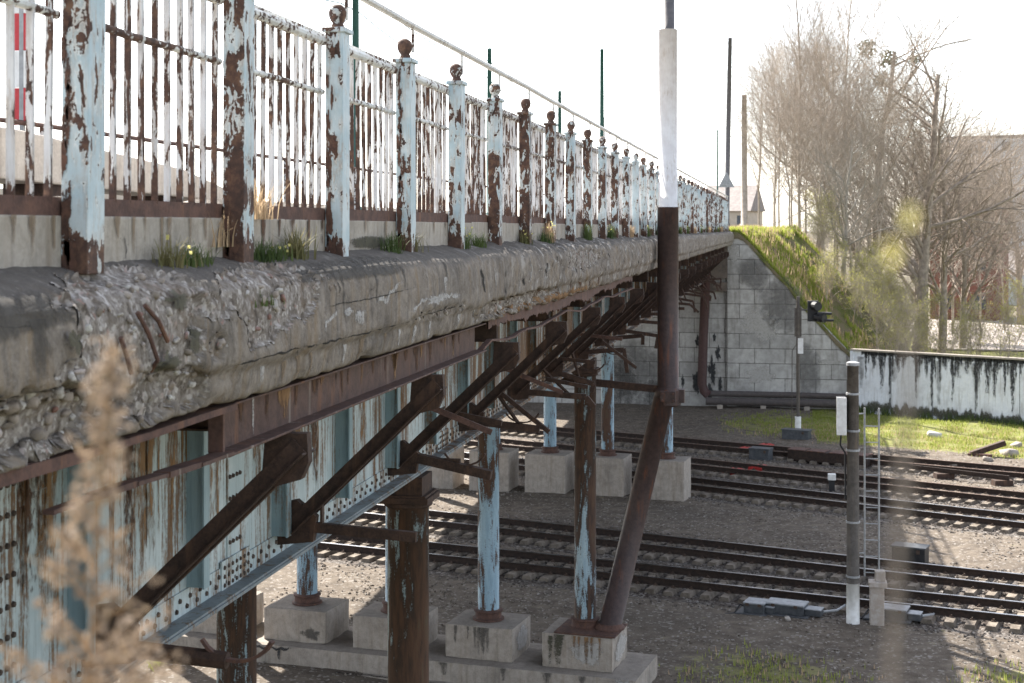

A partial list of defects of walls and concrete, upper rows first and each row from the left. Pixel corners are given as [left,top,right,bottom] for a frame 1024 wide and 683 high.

spalling [0,17,338,472]
water stain [859,351,1024,411]
rust [16,470,58,602]
rust [112,431,187,595]
rust [210,462,219,516]
rust [295,422,318,480]